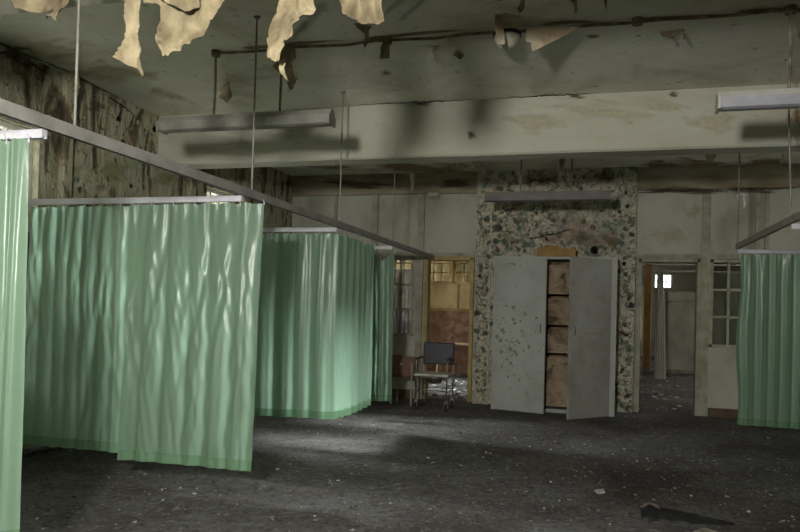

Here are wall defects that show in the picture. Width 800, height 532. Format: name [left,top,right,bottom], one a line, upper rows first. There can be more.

damp [44,135,59,173]